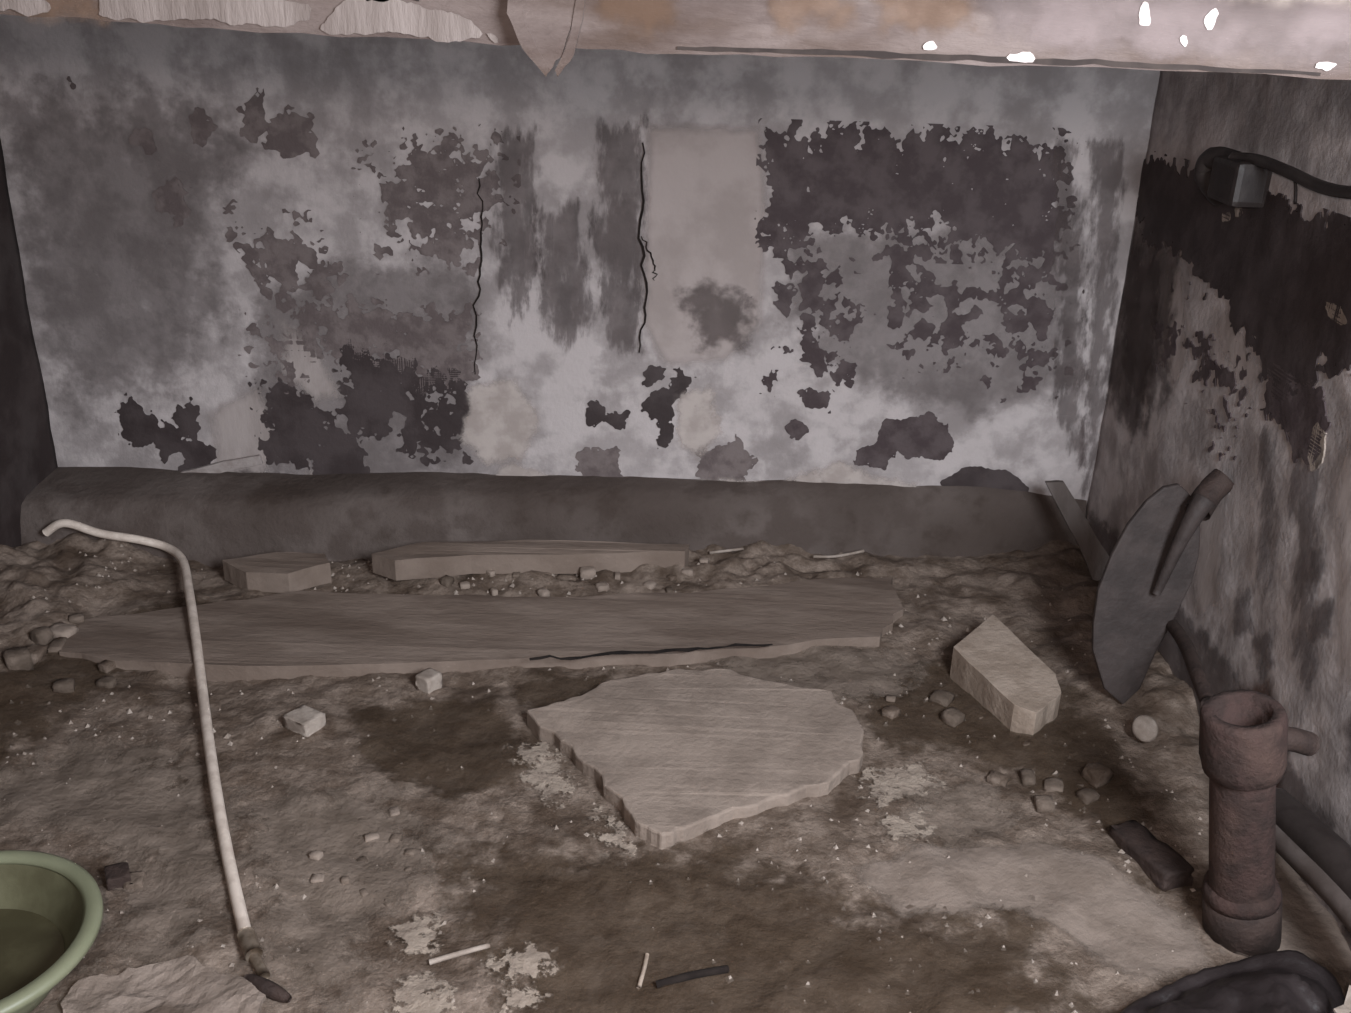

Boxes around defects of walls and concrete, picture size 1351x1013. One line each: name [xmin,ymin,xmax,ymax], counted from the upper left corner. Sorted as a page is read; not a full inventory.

peeling [1007,52,1035,62]
peeling [236,87,320,159]
peeling [351,124,521,277]
peeling [223,199,483,475]
peeling [754,118,1086,440]
damp [1108,195,1187,434]
damp [1220,313,1259,394]
peeling [115,392,217,471]
peeling [575,446,624,477]
peeling [585,365,697,449]
peeling [695,434,759,482]
damp [1311,449,1351,689]